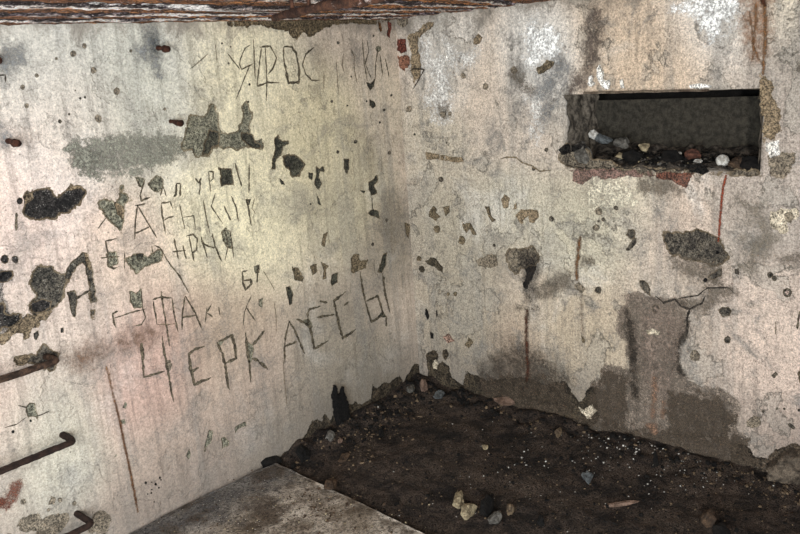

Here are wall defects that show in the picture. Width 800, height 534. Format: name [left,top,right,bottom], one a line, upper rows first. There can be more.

flaking render [17,100,264,233]
flaking render [271,134,325,205]
flaking render [0,254,72,372]
flaking render [476,244,540,275]
flaking render [532,271,571,298]
crack [655,287,734,338]
flaking render [662,228,738,319]
water stain [349,291,800,472]
water stain [302,414,335,439]